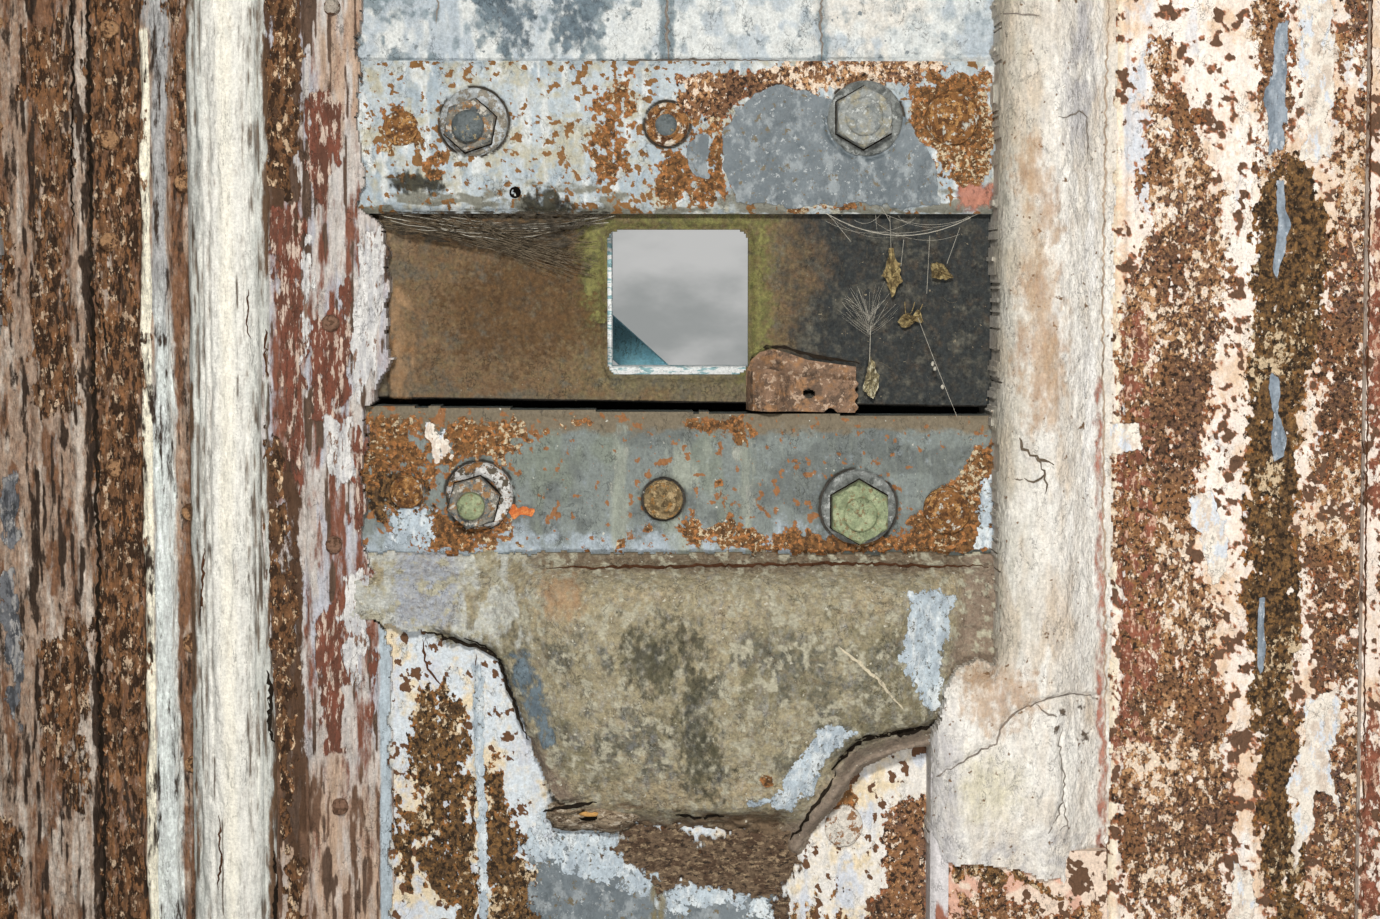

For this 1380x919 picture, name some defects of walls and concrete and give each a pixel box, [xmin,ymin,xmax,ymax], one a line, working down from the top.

corrosion [585,61,996,212]
crack [817,0,825,61]
peeling [1295,0,1340,162]
peeling [261,0,438,919]
corrosion [674,438,994,555]
crack [936,0,1110,844]
peeling [1110,423,1143,454]
corrosion [1095,0,1380,919]
crack [543,801,597,812]
crack [790,724,932,840]
peeling [1286,687,1348,869]
corrosion [948,864,1103,919]